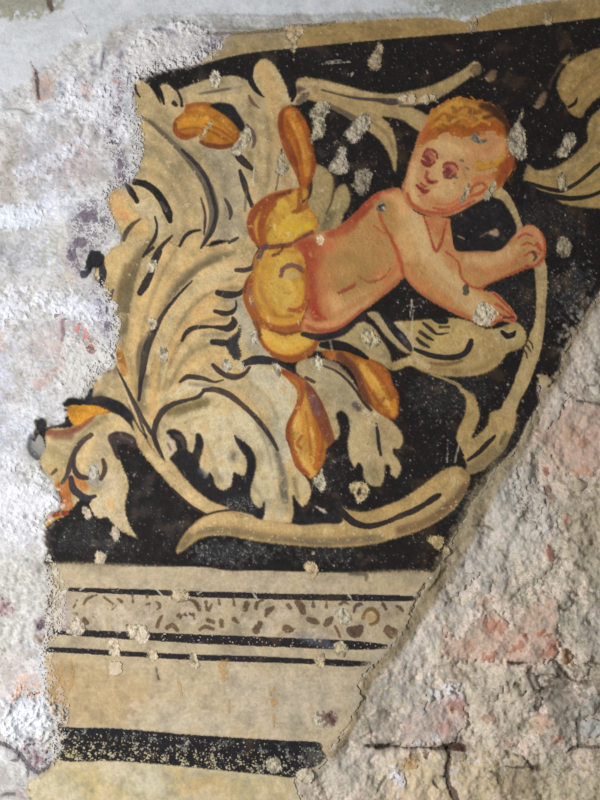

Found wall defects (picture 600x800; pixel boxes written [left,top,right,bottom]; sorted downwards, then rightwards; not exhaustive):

peeling [101,57,128,185]
spalling [309,100,330,144]
spalling [328,113,373,196]
spalling [509,110,527,160]
peeling [0,202,43,232]
peeling [66,198,108,278]
peeling [58,289,114,397]
spalling [94,551,107,565]
spalling [294,291,600,800]
spalling [107,638,122,676]
spalling [127,624,158,662]
crack [365,738,466,800]